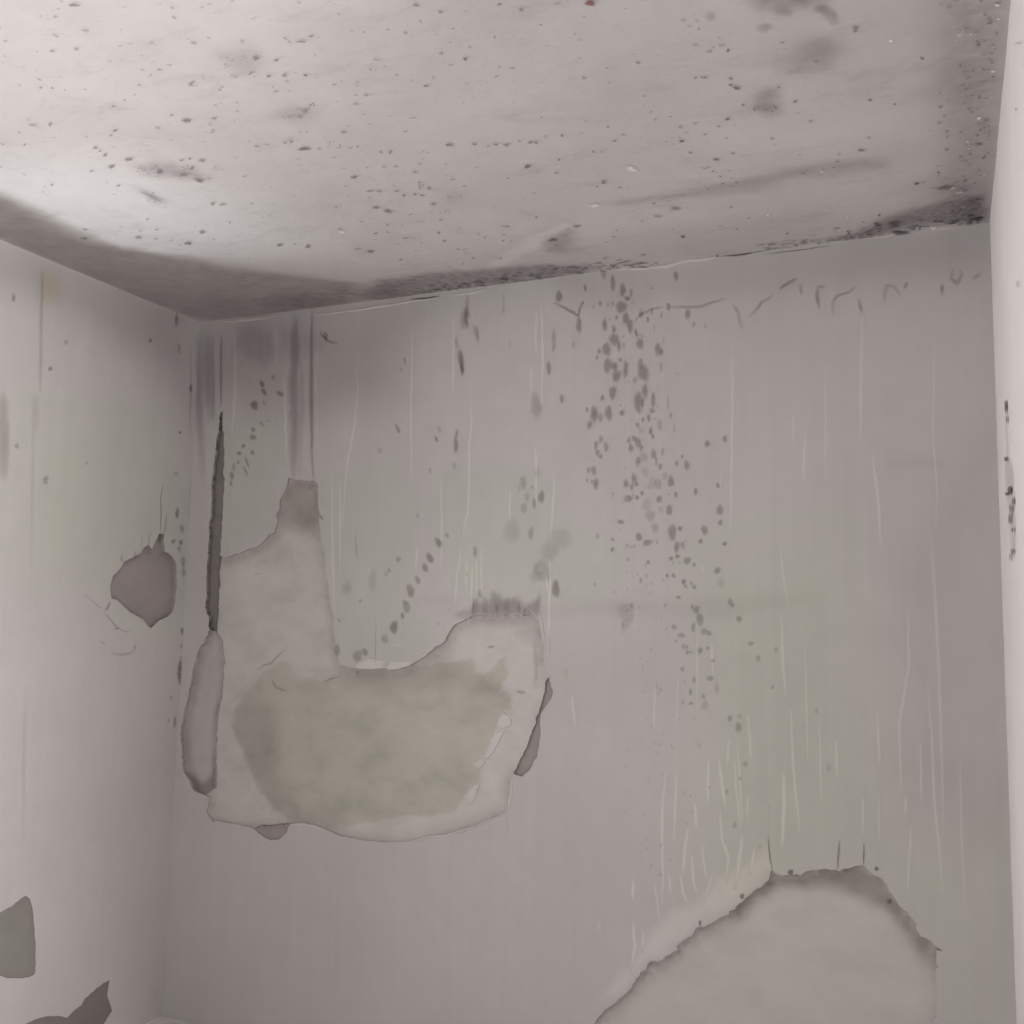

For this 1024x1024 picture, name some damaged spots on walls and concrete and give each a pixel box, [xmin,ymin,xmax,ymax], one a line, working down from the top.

flaking render [110,534,177,628]
crack [206,412,225,631]
flaking render [180,411,553,843]
peeling [0,896,36,978]
peeling [26,980,112,1024]
flaking render [595,865,942,1024]